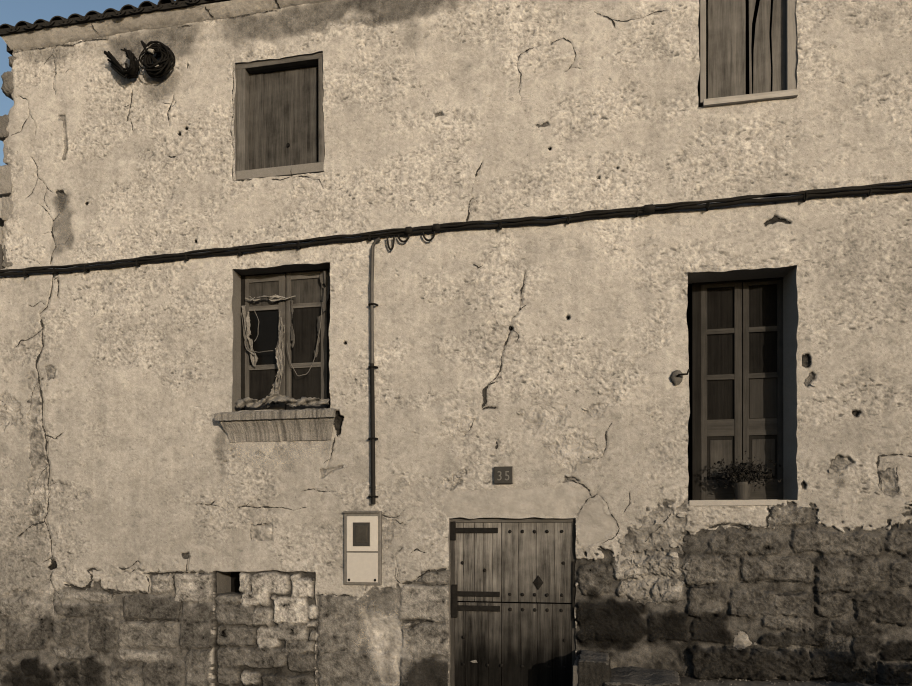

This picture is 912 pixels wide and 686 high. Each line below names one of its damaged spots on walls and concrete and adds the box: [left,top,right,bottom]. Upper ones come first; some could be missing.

crack [517,37,579,101]
damp [54,195,73,252]
crack [14,157,204,623]
crack [465,272,526,435]
crack [567,479,631,567]
flaking render [618,499,692,605]
crack [686,505,770,534]
flaking render [876,468,898,497]